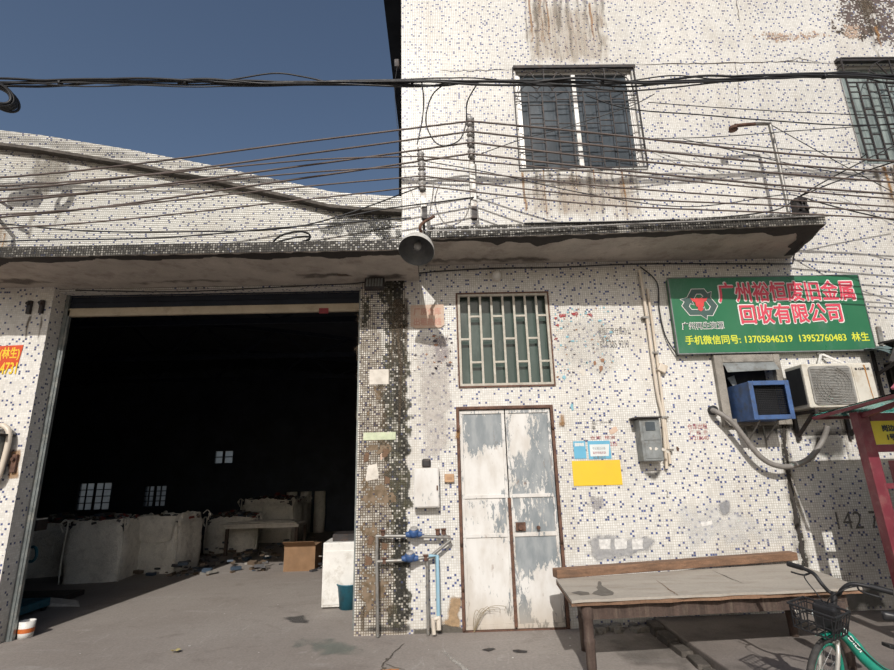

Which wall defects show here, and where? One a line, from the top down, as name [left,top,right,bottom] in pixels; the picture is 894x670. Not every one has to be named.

damp [827,0,894,50]
damp [361,274,462,634]
damp [742,424,808,568]